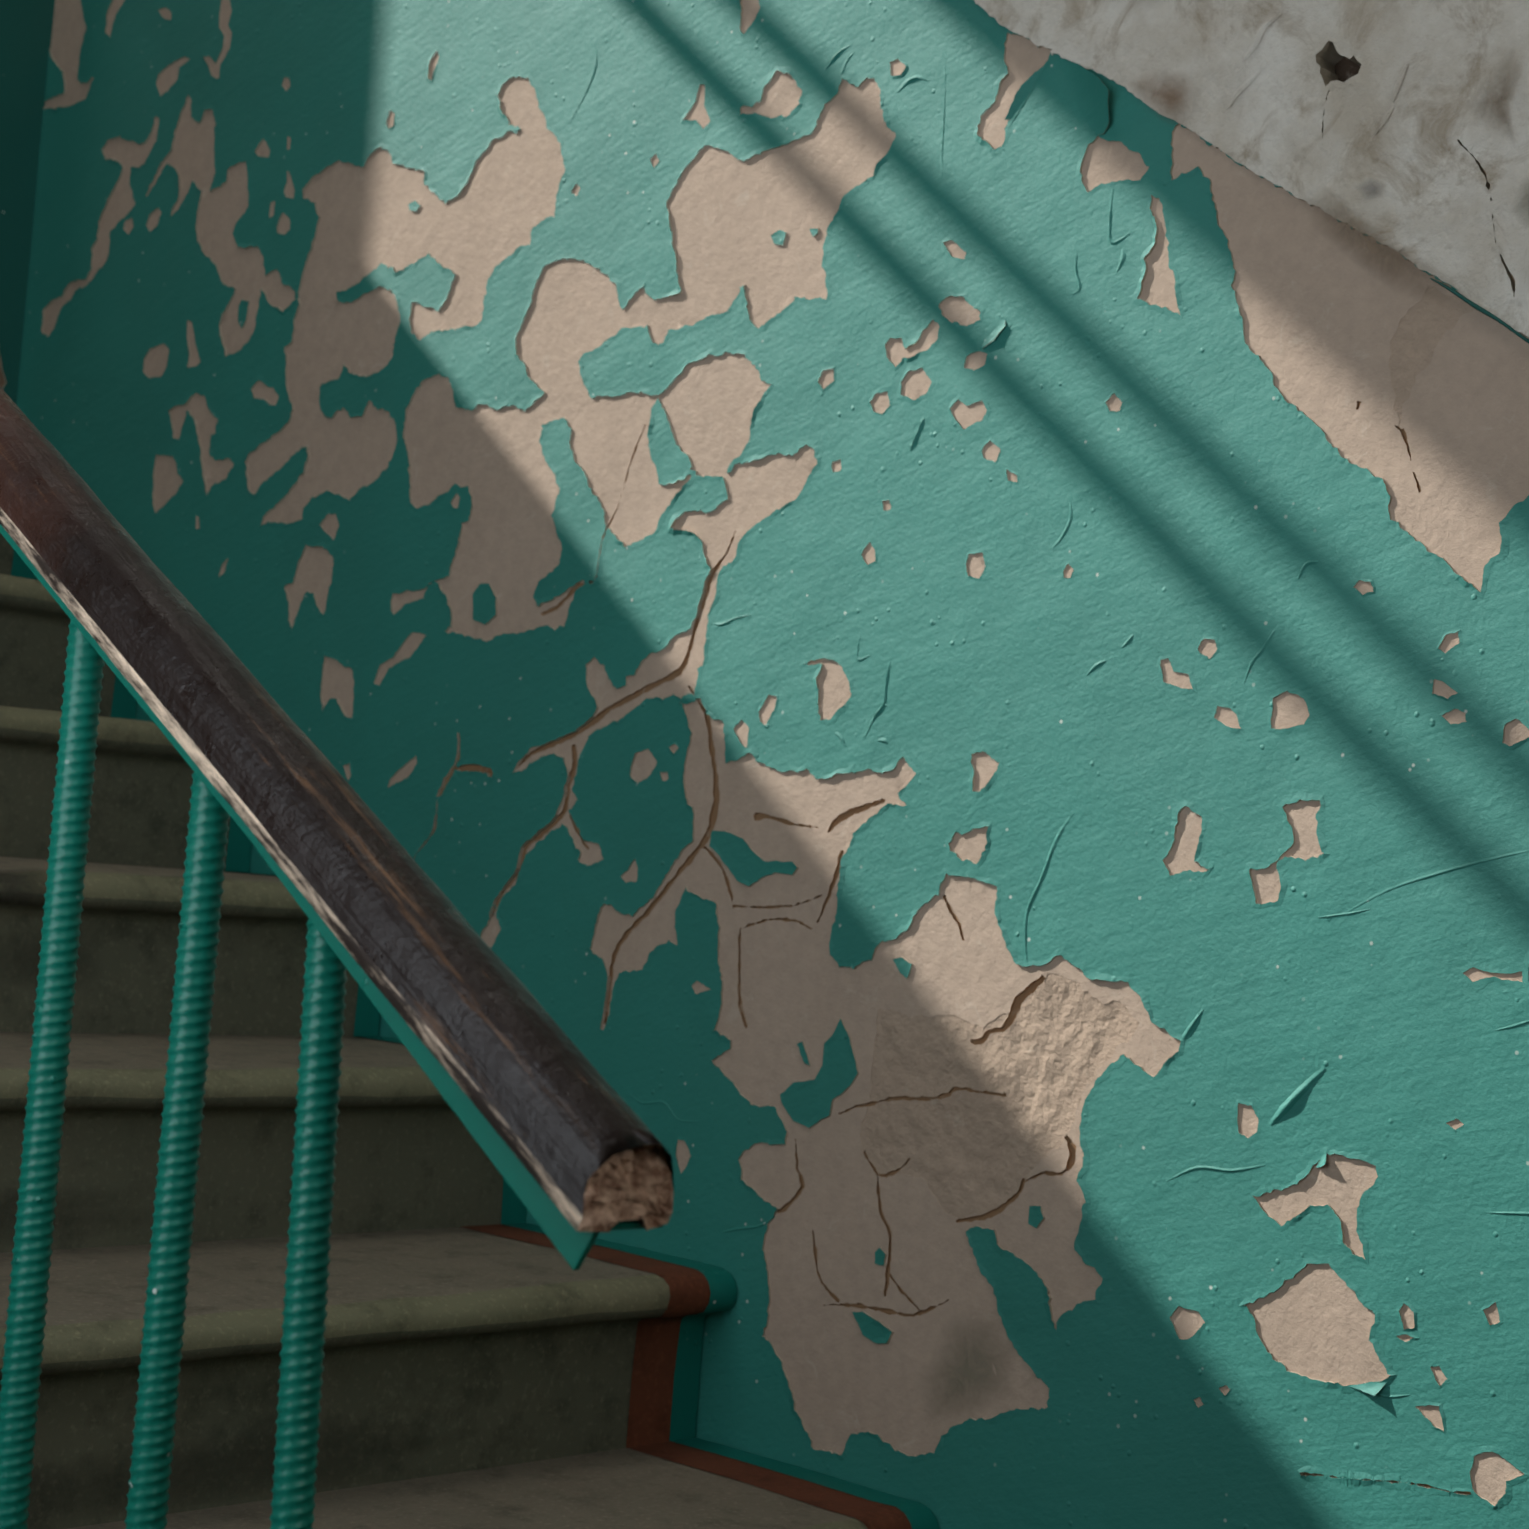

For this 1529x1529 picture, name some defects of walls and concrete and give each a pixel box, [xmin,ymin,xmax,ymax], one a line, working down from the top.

peeling [973,28,1529,599]
crack [541,425,646,616]
peeling [39,0,1186,1464]
crack [434,530,885,1028]
peeling [1158,800,1213,880]
peeling [1243,791,1330,909]
spalling [1165,1301,1207,1346]
peeling [1239,1146,1419,1396]
crack [1297,1465,1474,1498]
spalling [1461,1446,1529,1511]